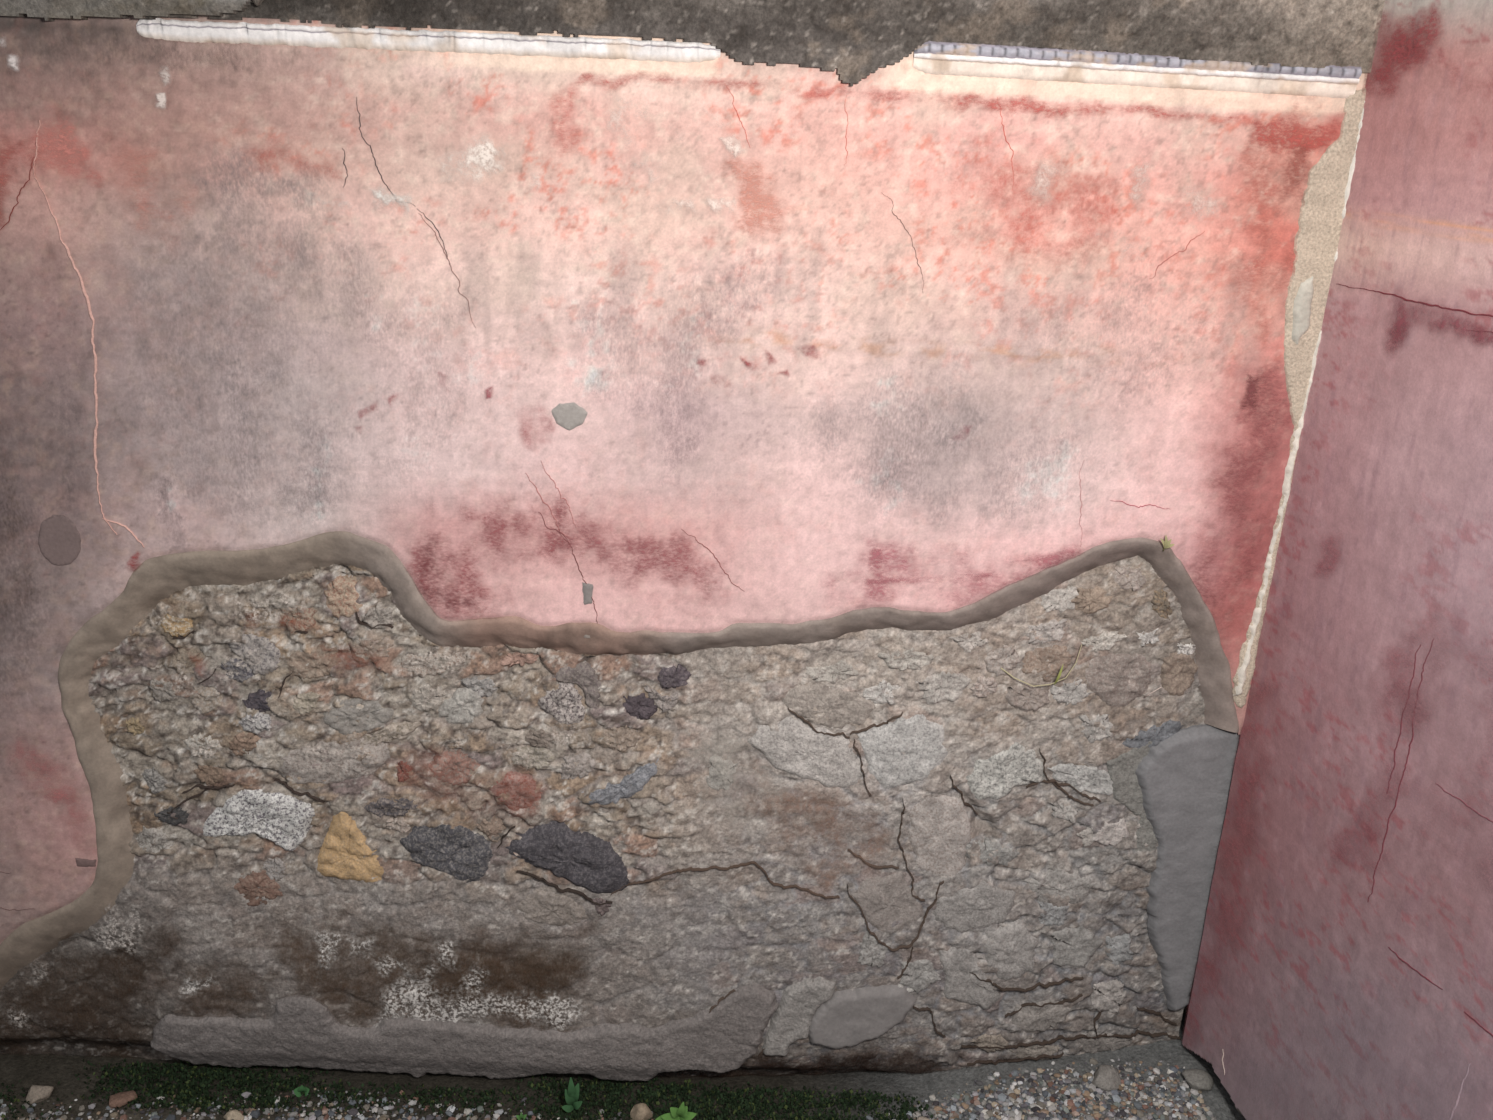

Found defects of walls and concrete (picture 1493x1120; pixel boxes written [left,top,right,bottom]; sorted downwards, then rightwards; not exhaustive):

crack [0,120,144,547]
peeling [156,68,170,108]
crack [342,102,476,328]
peeling [443,140,502,178]
crack [882,193,924,290]
spalling [1232,87,1366,708]
crack [538,512,598,624]
flaking render [0,531,1241,1081]
crack [497,708,1181,1066]